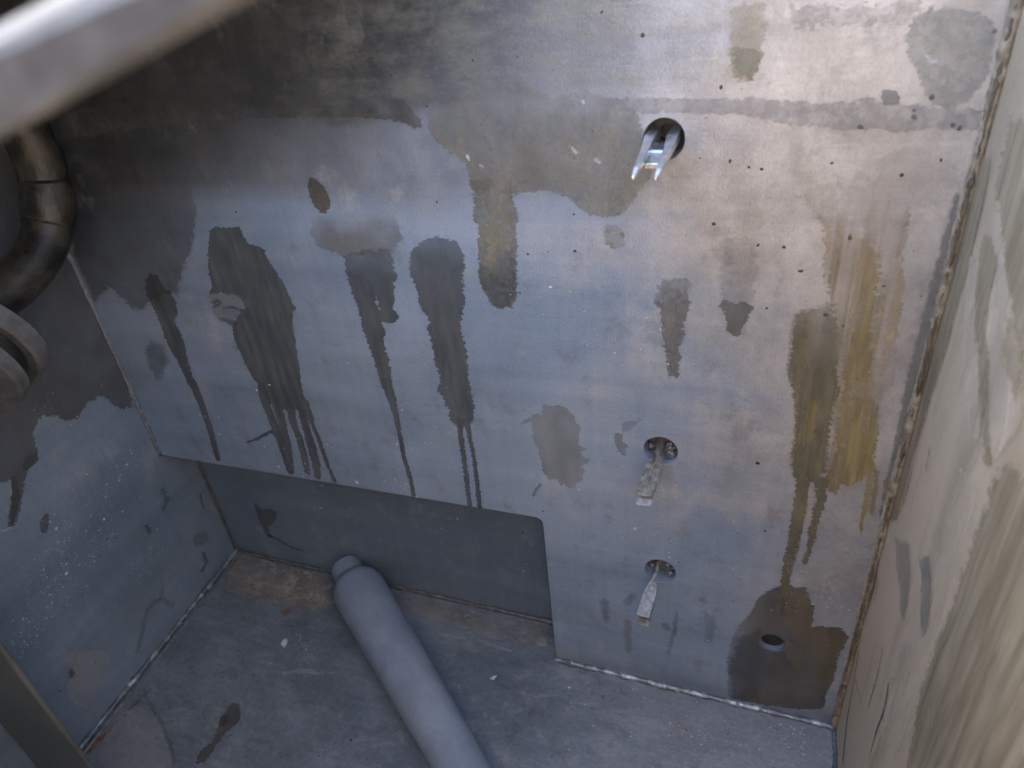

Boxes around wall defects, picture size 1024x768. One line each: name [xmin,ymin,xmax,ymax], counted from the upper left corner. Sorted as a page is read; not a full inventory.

water stain [908,7,995,107]
water stain [145,273,221,461]
water stain [207,226,337,483]
water stain [345,179,519,508]
water stain [655,287,691,379]
water stain [718,300,754,337]
corrosion [780,251,905,596]
water stain [740,585,849,710]